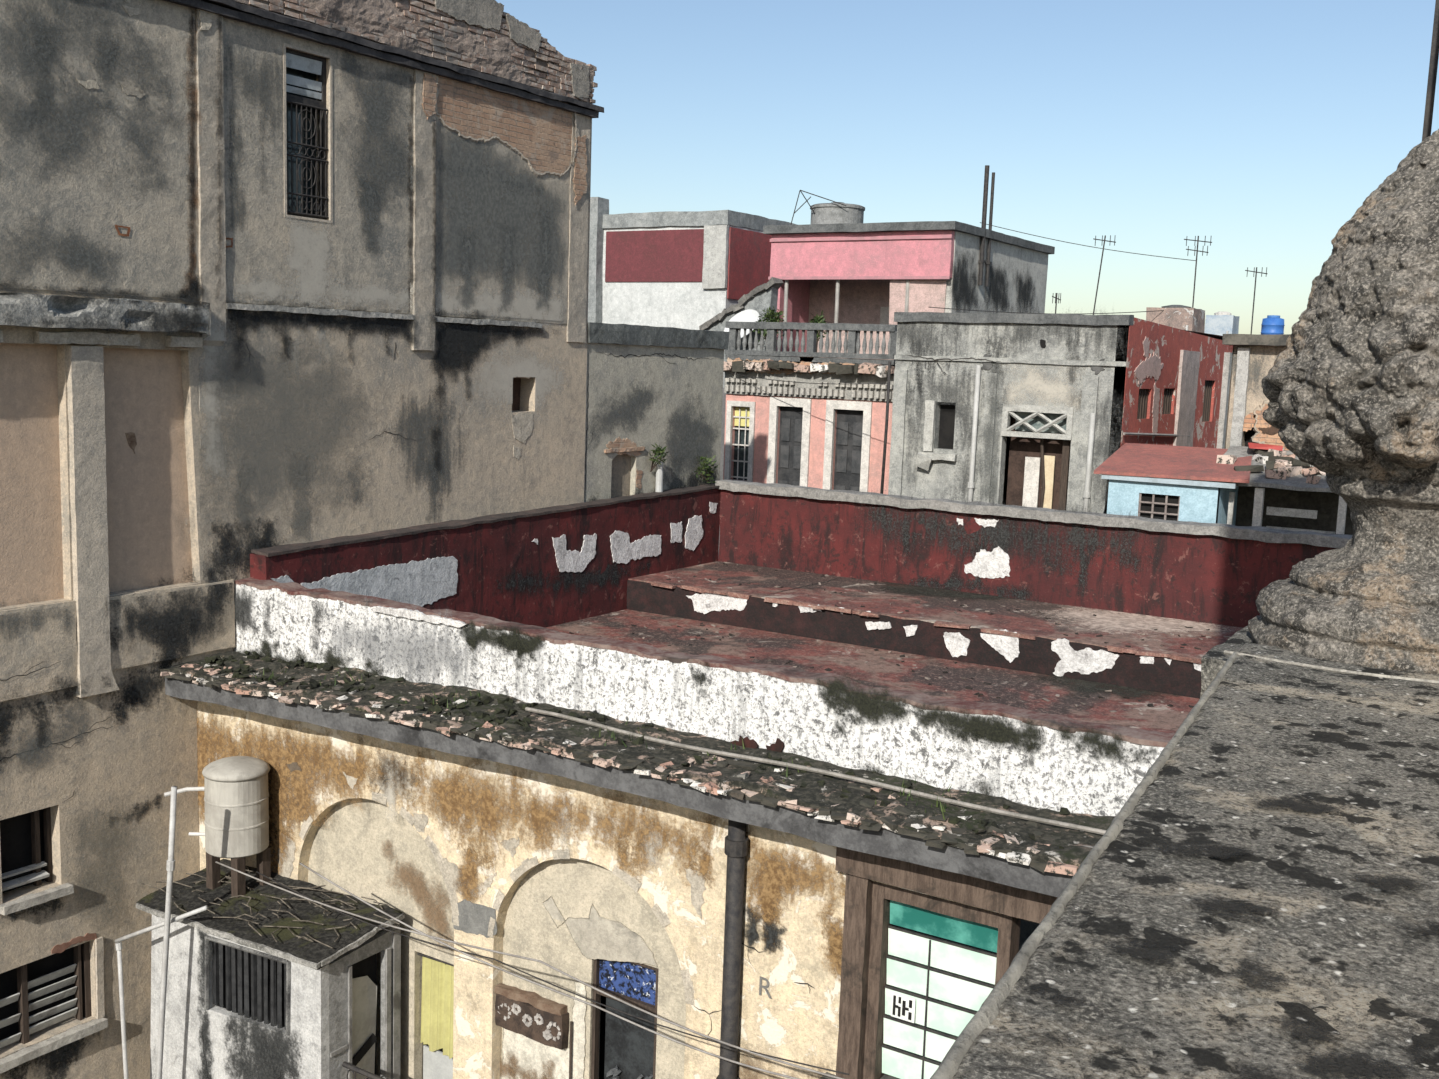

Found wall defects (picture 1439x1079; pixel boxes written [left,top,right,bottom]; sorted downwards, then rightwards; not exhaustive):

flaking render [422,73,588,205]
water stain [0,0,565,725]
water stain [860,251,1226,634]
peeling [531,502,718,572]
peeling [957,518,999,528]
peeling [964,546,1011,579]
peeling [687,592,748,614]
peeling [865,611,918,637]
peeling [943,629,1020,663]
water stain [0,677,87,771]
water stain [109,796,161,826]
water stain [197,929,301,1079]